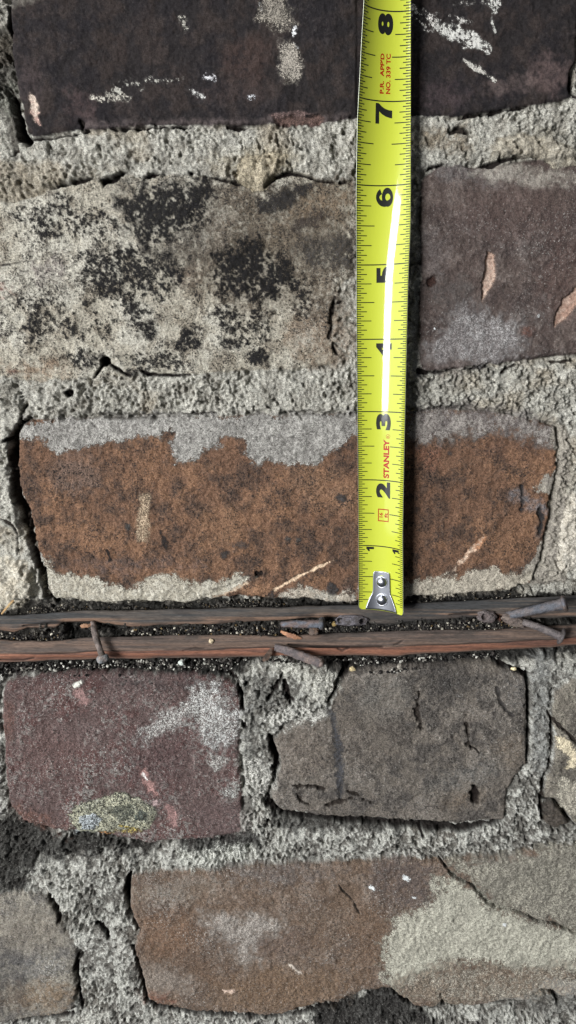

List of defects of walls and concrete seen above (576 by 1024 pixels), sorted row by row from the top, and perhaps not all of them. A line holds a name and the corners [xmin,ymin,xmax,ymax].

leakage [182,173,222,223]
crack [94,356,191,379]
crack [2,404,61,600]
crack [263,733,576,933]